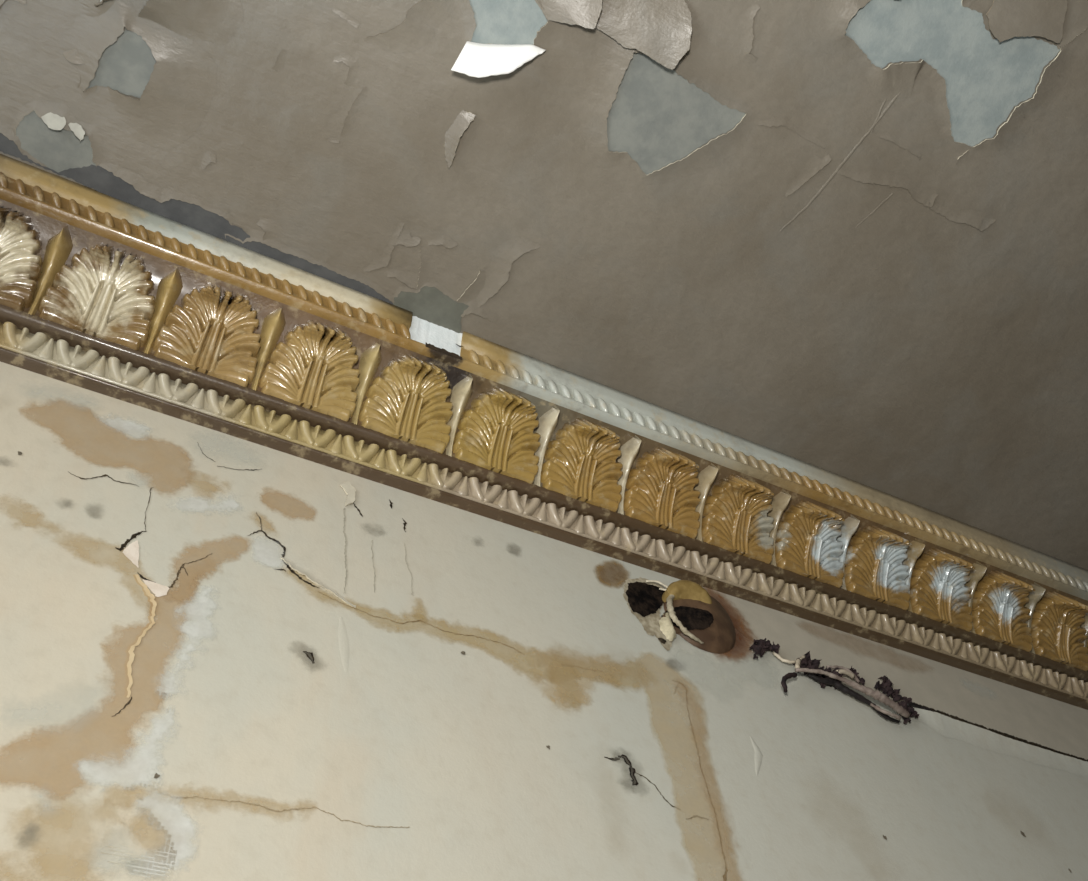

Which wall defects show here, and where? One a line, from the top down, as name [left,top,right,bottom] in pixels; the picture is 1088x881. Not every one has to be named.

peeling [455,0,755,185]
peeling [809,0,1088,166]
peeling [0,99,540,360]
crack [69,472,154,551]
leakage [28,400,239,511]
crack [137,554,210,588]
leakage [261,493,315,518]
crack [248,512,525,655]
leakage [596,562,627,587]
leakage [0,538,291,877]
peeling [623,577,1088,778]
crack [915,705,1088,762]